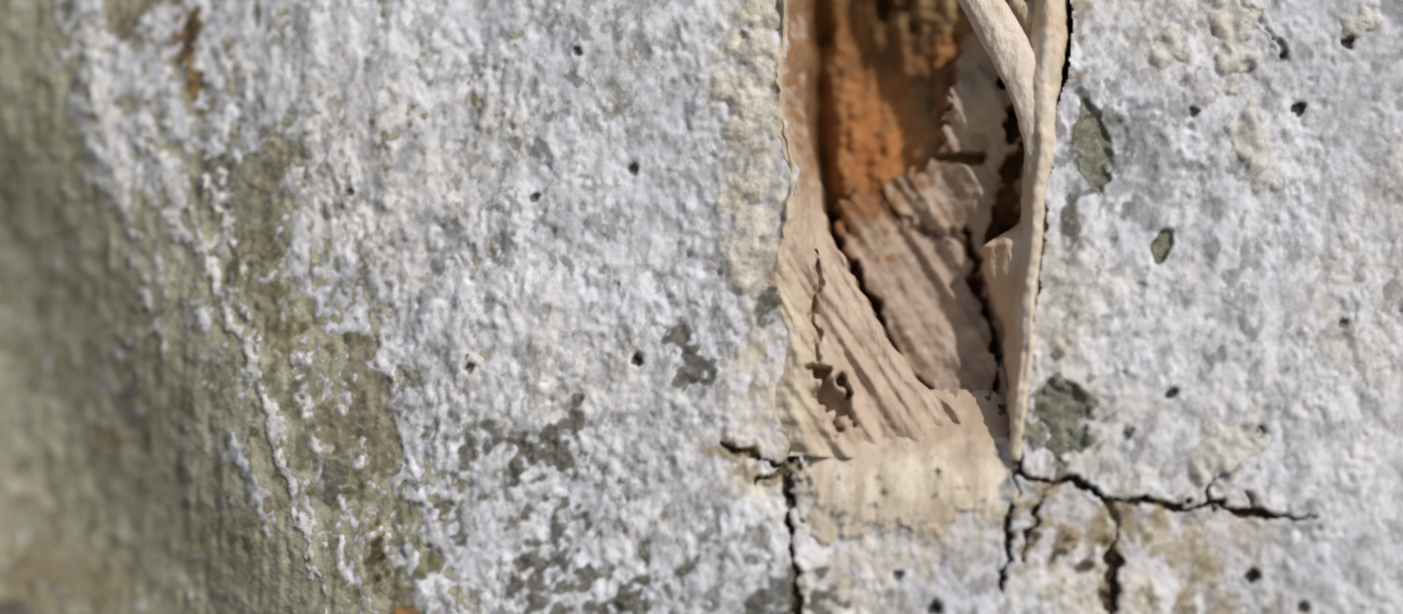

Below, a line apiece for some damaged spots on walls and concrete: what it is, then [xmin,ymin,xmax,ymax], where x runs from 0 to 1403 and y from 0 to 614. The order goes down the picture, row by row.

damp [182,9,203,56]
spalling [766,0,1120,543]
damp [0,580,36,614]
crack [721,442,813,614]
crack [998,459,1317,614]